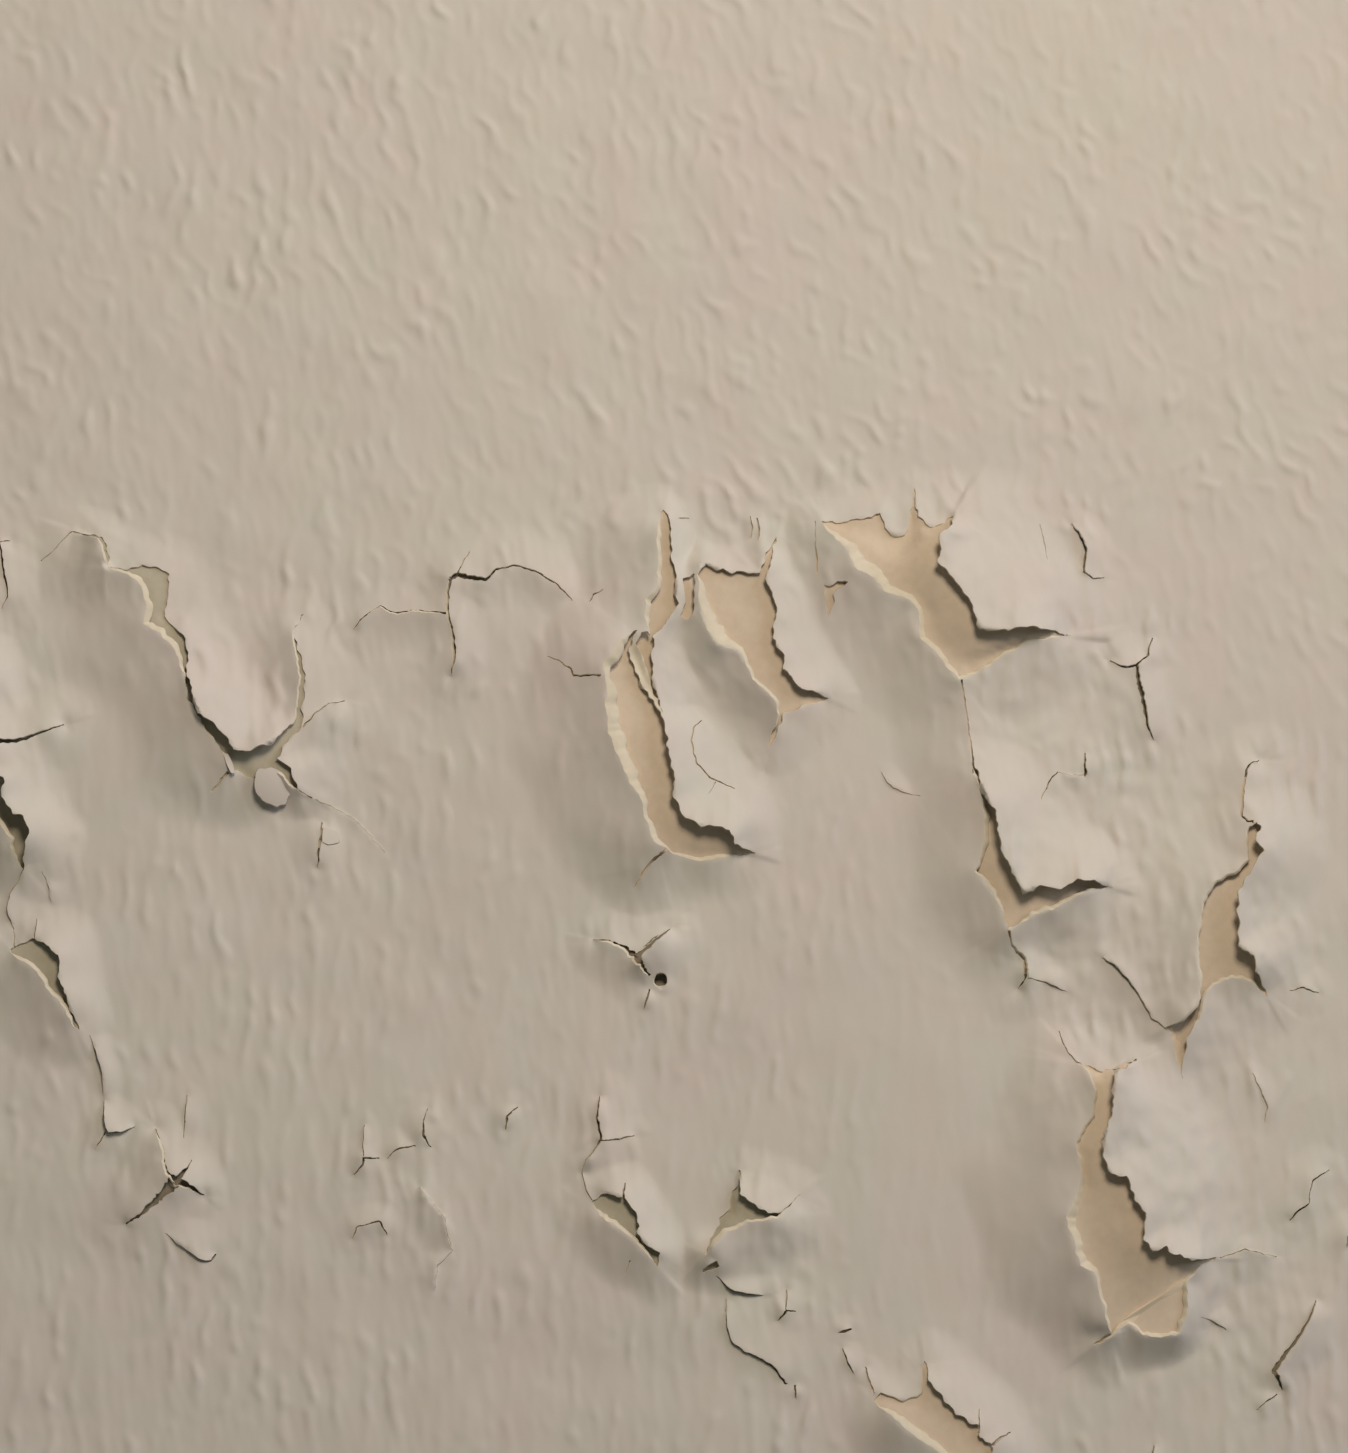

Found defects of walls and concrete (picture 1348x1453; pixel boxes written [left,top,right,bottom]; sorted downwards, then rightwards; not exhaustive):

crack [343,541,612,686]
peeling [0,518,394,1160]
crack [582,920,681,1019]
peeling [537,455,1329,1369]
crack [1281,1159,1340,1230]
peeling [691,1155,825,1409]
crack [1247,1290,1328,1421]